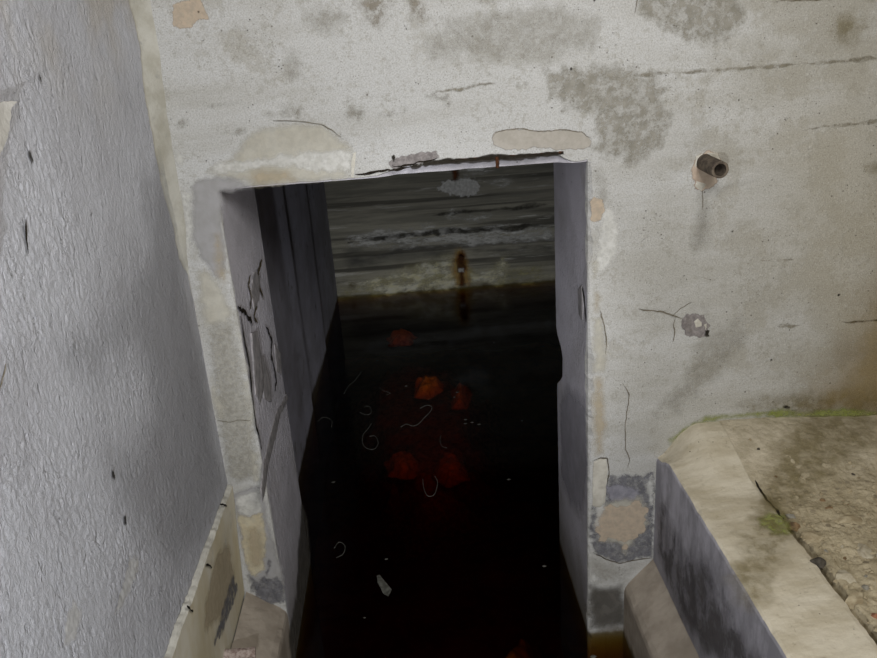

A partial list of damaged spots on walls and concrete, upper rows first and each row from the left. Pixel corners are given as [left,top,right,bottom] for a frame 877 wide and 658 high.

crack [686,56,876,74]
spalling [692,150,721,191]
spalling [590,197,619,273]
rust [454,251,468,286]
peeling [590,458,655,564]